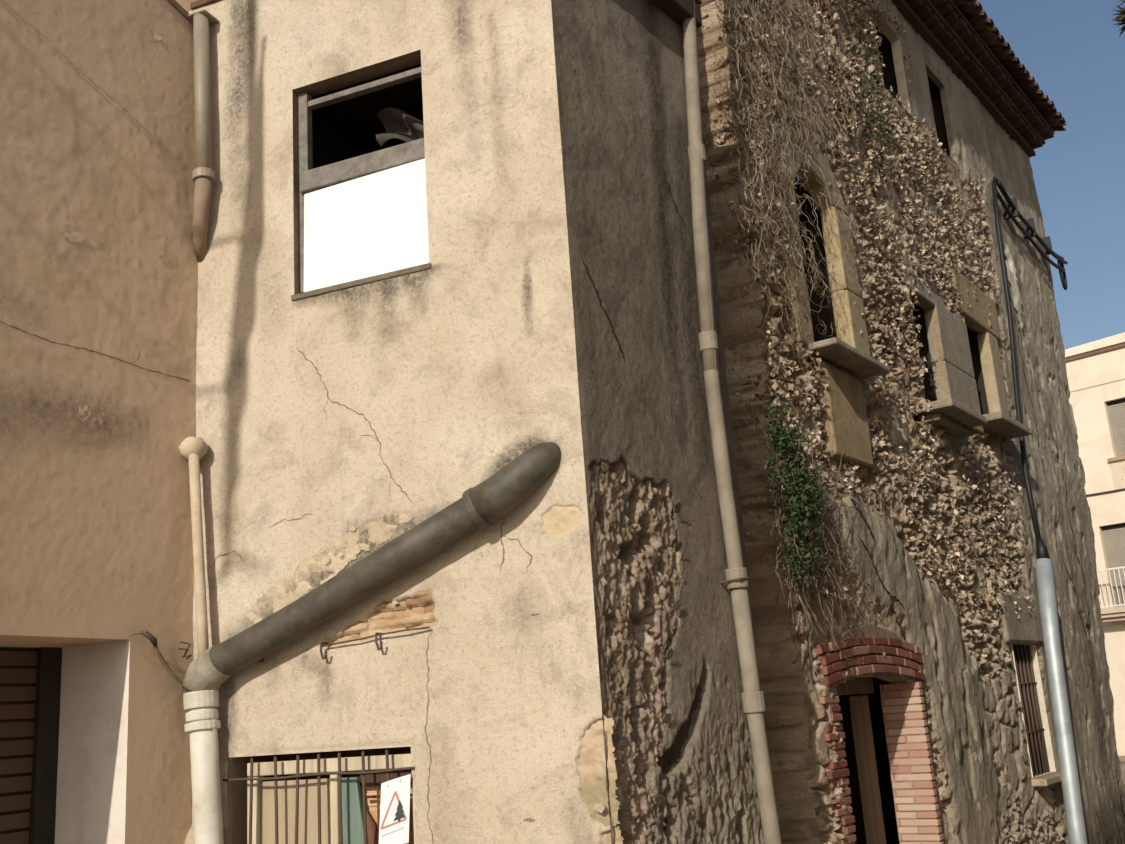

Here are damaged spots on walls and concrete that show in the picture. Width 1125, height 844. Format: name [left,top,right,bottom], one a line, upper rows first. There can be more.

crack [1,322,192,388]
crack [581,256,625,362]
crack [295,346,416,505]
flaking render [243,511,413,624]
flaking render [323,590,437,649]
flaking render [543,458,702,844]
crack [424,632,436,844]